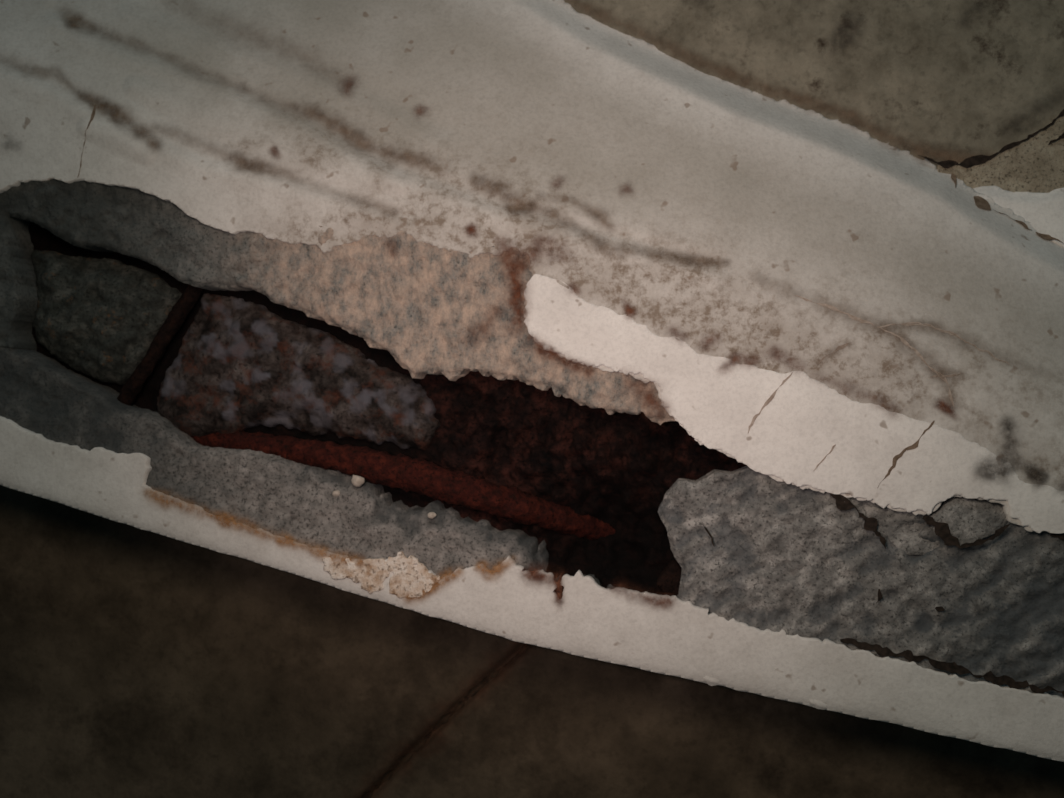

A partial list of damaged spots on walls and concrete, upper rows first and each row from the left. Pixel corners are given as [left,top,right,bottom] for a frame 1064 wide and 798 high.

spalling [0,179,1064,698]